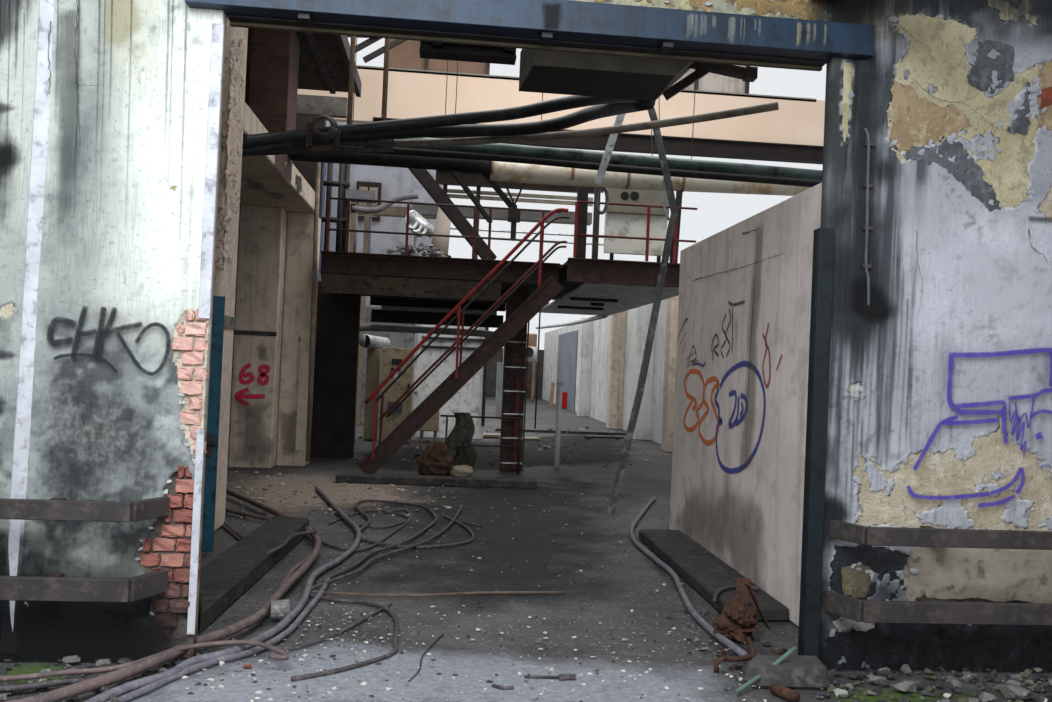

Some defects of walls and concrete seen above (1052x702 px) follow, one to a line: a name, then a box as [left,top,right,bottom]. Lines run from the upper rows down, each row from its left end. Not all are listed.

peeling [634,0,714,12]
peeling [727,0,826,20]
peeling [988,0,1038,25]
peeling [886,13,1052,218]
flaking render [135,307,212,662]
peeling [853,411,1052,531]
peeling [830,545,910,601]